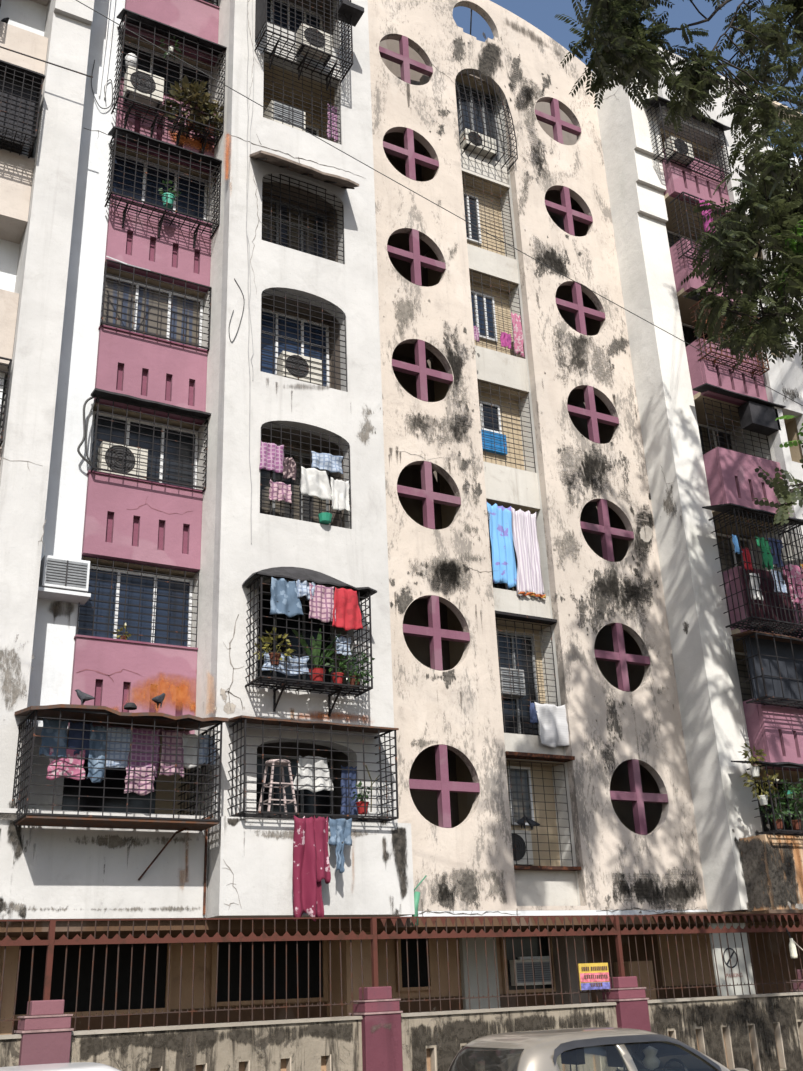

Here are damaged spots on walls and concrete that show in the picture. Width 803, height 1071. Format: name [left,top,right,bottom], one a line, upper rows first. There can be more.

water stain [477,32,558,217]
water stain [525,230,582,285]
water stain [544,326,630,404]
water stain [553,435,659,636]
water stain [390,524,485,614]
corrosion [134,676,212,714]
water stain [0,800,26,859]
water stain [0,898,67,919]
water stain [427,868,506,913]
water stain [605,867,707,914]
water stain [80,1028,255,1060]
water stain [655,995,803,1071]